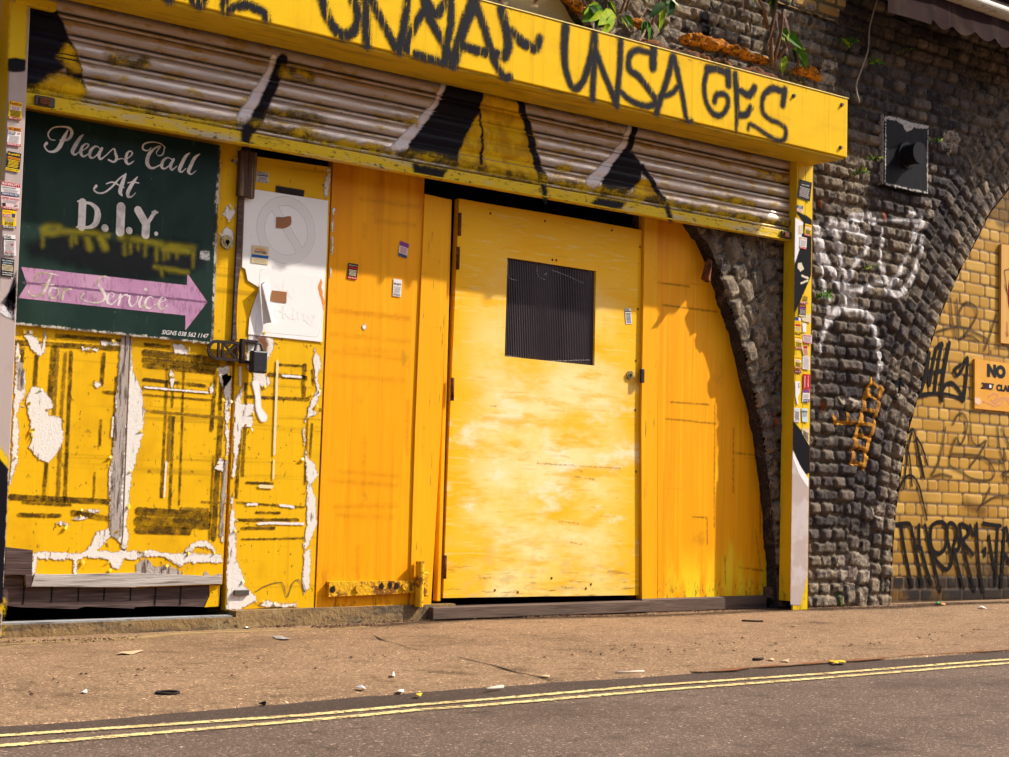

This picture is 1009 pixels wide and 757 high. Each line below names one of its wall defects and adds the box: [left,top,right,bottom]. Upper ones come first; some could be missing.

peeling [9,329,64,485]
peeling [32,331,323,610]
crack [461,657,556,681]